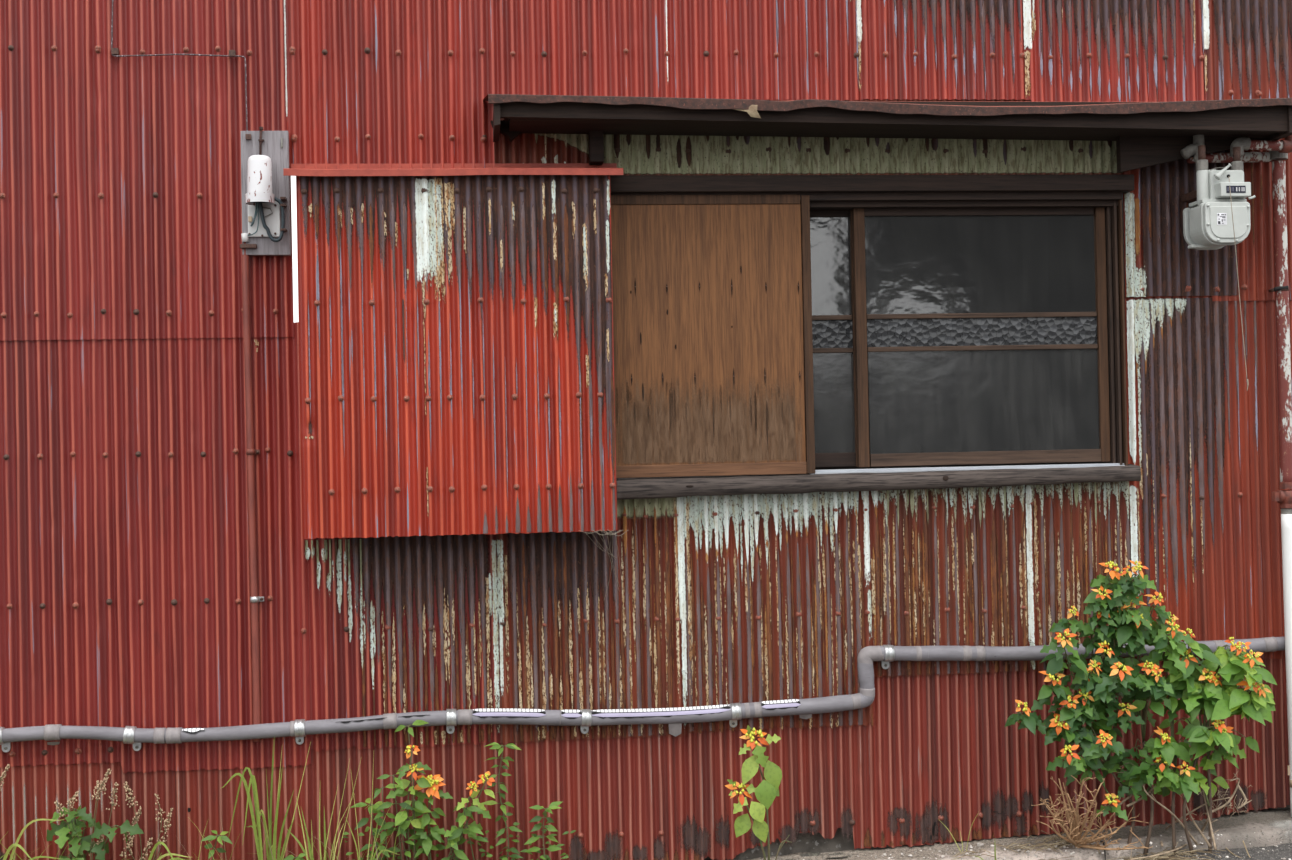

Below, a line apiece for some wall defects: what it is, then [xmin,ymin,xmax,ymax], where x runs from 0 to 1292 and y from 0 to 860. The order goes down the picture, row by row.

peeling [338,203,364,226]
peeling [407,177,466,413]
peeling [488,200,503,272]
corrosion [1251,150,1263,243]
corrosion [300,149,1258,747]
peeling [1114,192,1187,577]
peeling [422,491,935,726]
peeling [938,514,969,642]
peeling [982,485,1081,669]
peeling [1084,501,1097,572]
peeling [392,620,406,734]